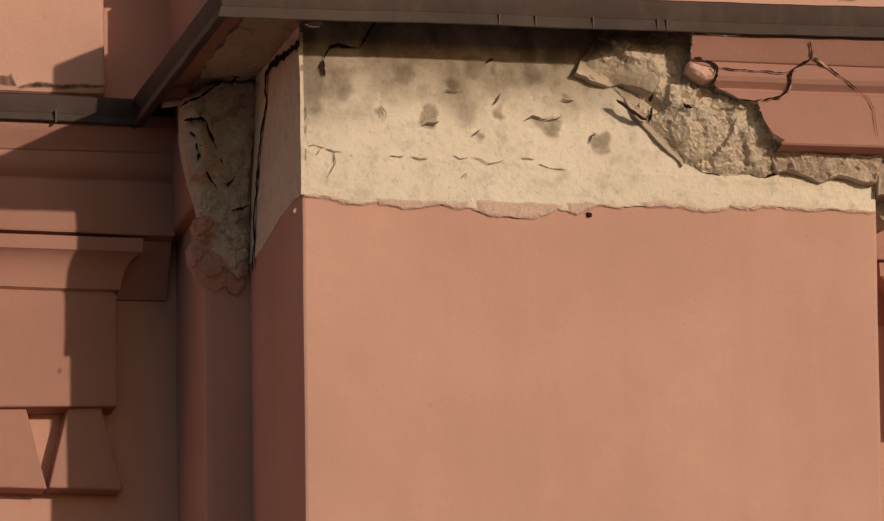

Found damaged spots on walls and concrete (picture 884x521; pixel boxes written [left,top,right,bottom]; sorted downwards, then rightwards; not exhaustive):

crack [180,40,300,270]
crack [320,22,376,77]
flaking render [162,18,884,279]
crack [695,41,878,134]